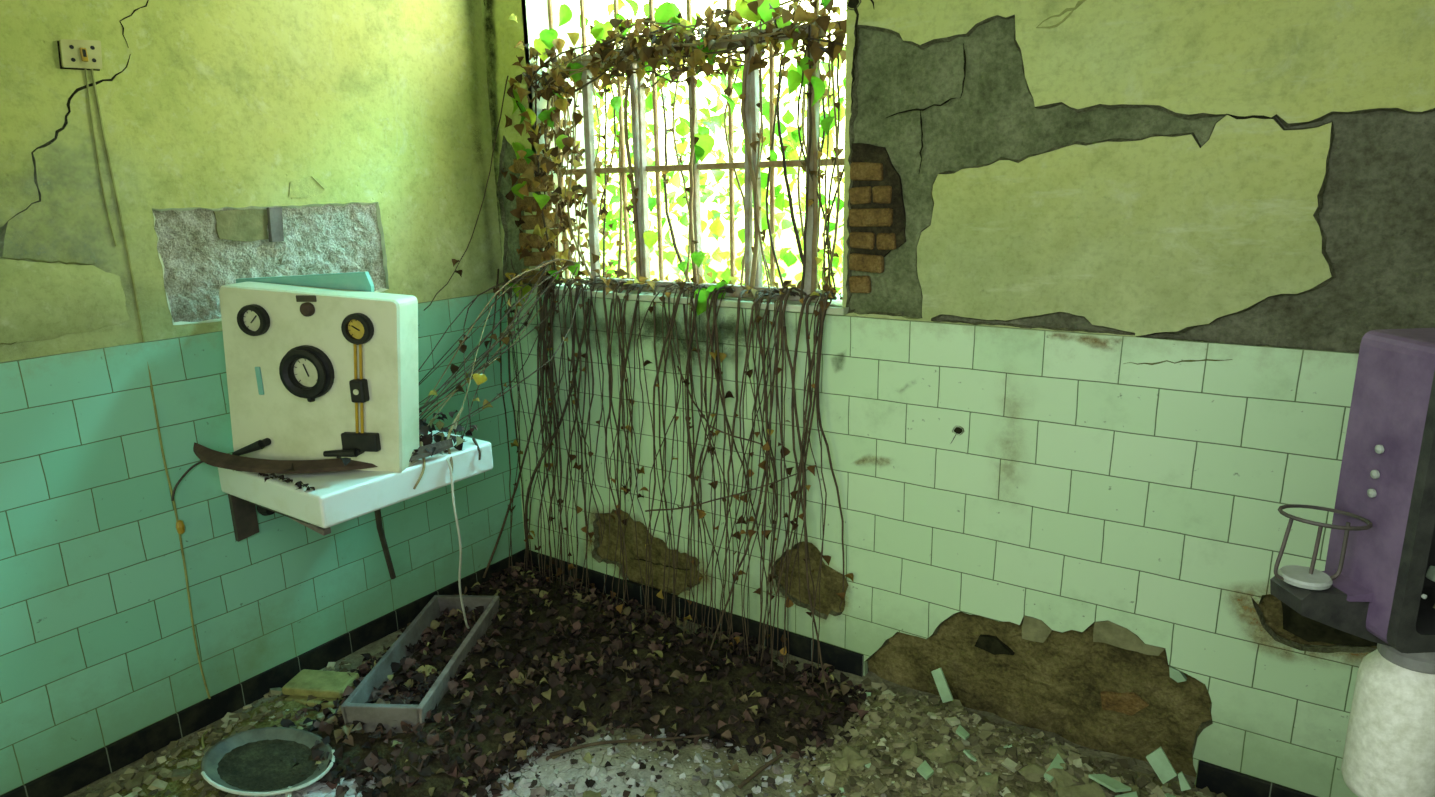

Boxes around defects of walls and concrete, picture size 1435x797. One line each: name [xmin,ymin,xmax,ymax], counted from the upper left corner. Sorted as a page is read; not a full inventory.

crack [1036,0,1086,29]
crack [1,257,92,265]
crack [8,0,149,221]
spalling [152,176,389,325]
leakage [485,0,500,233]
spalling [845,0,1435,353]
peeling [588,509,709,595]
peeling [772,542,848,620]
peeling [864,611,1213,777]
peeling [1235,594,1377,659]